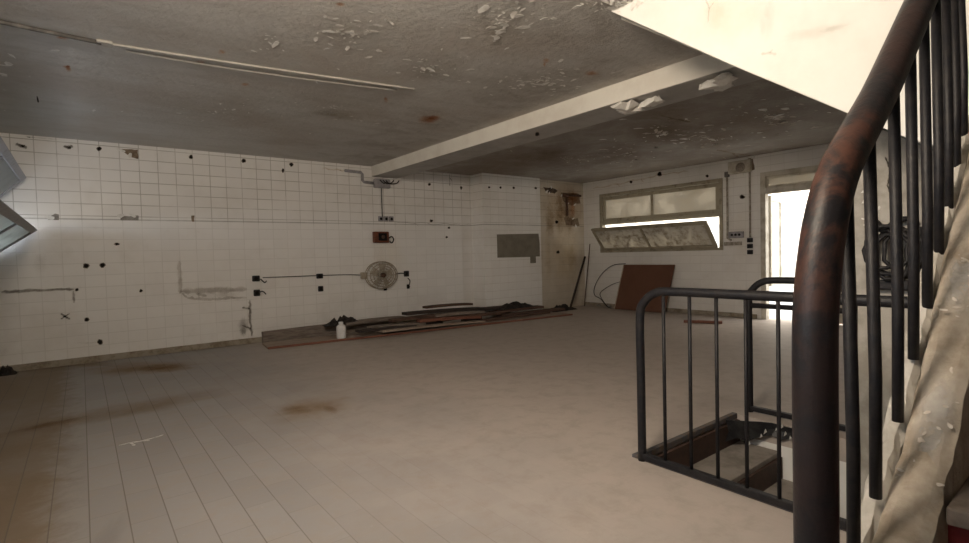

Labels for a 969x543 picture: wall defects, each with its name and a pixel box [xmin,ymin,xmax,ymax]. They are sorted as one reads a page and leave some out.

peeling [314,11,394,58]
peeling [460,0,557,50]
spalling [699,72,738,91]